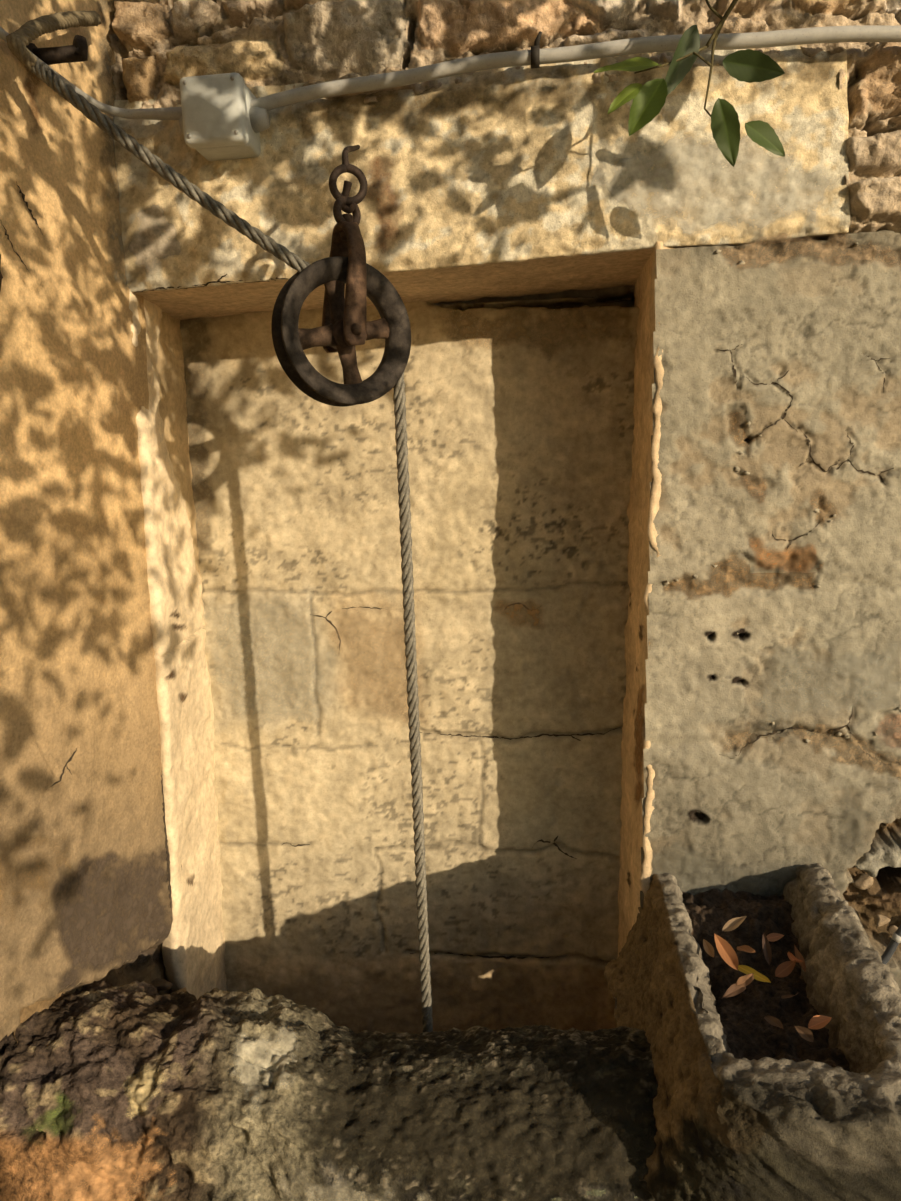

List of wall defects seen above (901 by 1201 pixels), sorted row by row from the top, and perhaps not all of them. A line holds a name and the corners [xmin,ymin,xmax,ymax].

crack [716,344,894,484]
crack [719,707,901,765]
spalling [842,815,901,970]